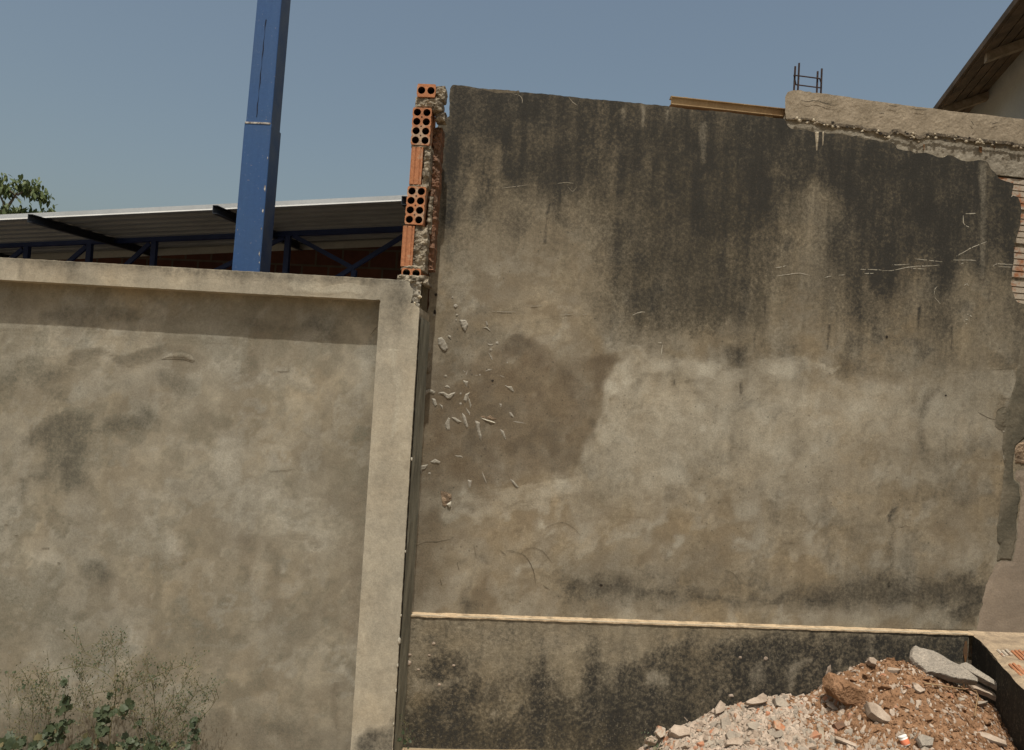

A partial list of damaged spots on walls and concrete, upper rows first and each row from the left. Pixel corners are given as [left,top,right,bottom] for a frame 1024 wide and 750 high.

spalling [409,127,445,308]
peeling [425,321,526,440]
water stain [394,85,1021,750]
spalling [1015,442,1024,464]